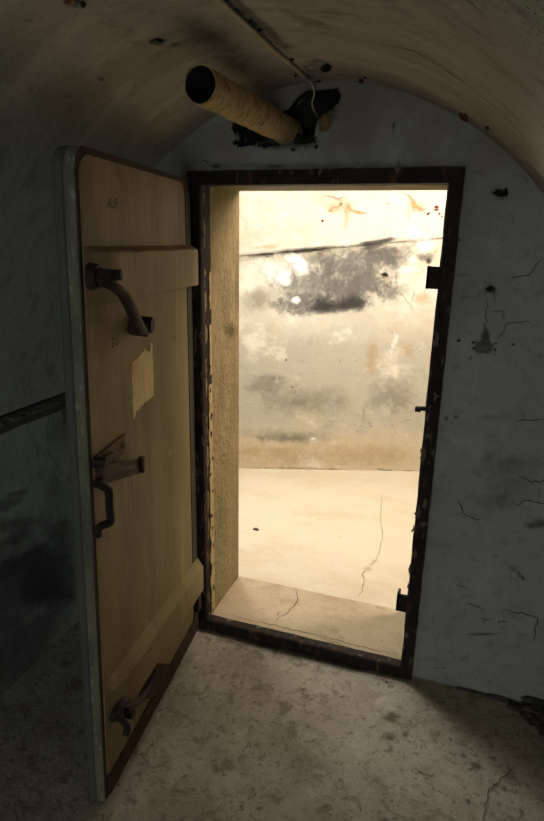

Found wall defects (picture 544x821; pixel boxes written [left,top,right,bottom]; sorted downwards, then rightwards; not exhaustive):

spalling [284,60,340,137]
water stain [280,233,404,314]
crack [231,591,395,654]
crack [453,582,542,642]
spalling [455,686,544,736]
crack [483,766,517,821]